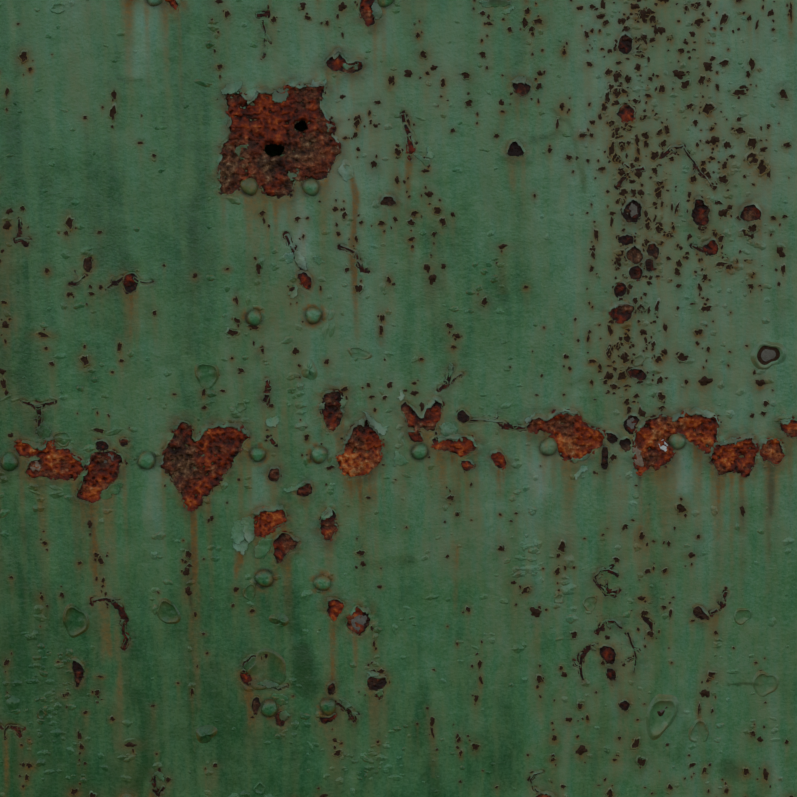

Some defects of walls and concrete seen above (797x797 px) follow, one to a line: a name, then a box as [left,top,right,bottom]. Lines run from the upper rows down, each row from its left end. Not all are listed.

rust [7,426,130,609]
rust [158,0,471,758]
rust [498,69,546,113]
rust [524,0,797,797]